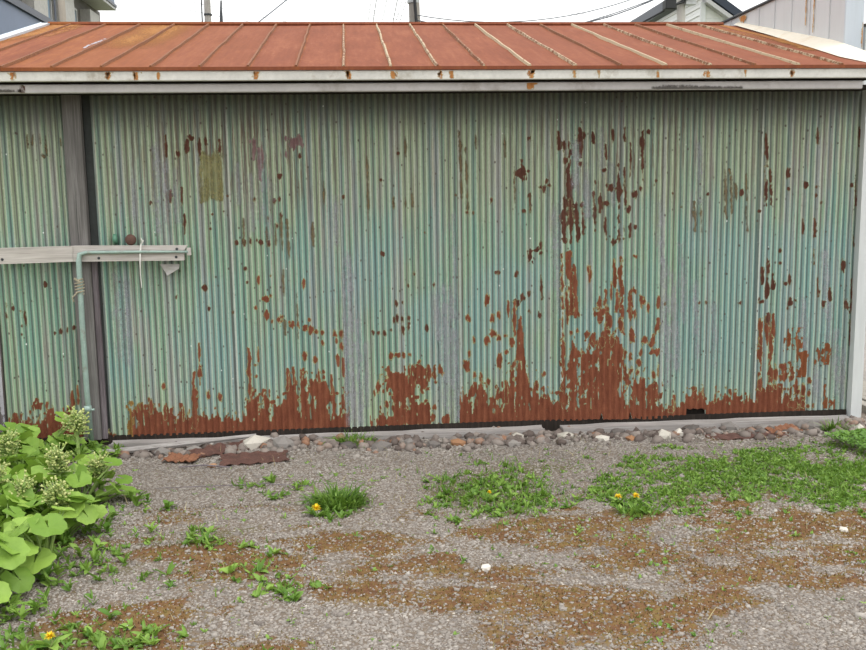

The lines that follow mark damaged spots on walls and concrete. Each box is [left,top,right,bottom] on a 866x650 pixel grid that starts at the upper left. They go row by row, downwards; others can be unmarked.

corrosion [1,25,82,42]
corrosion [113,25,186,46]
corrosion [710,14,816,50]
corrosion [235,213,291,257]
corrosion [370,127,835,426]
corrosion [108,269,350,437]